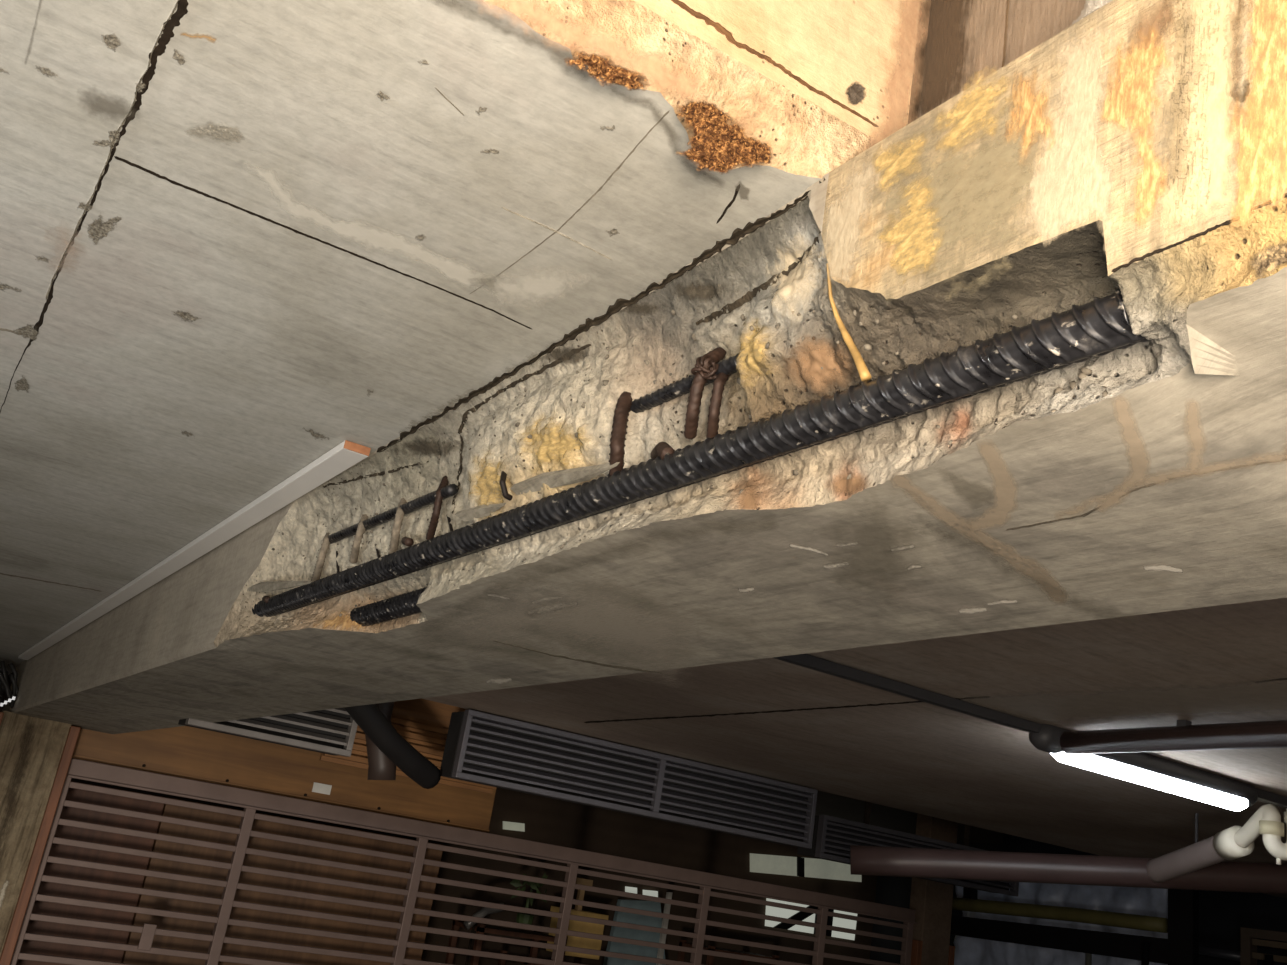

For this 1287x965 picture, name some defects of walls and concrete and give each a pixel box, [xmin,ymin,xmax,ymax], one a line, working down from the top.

crack [0,0,825,514]
crack [671,0,879,127]
water stain [908,0,969,120]
water stain [885,39,1112,269]
water stain [1157,0,1243,226]
spalling [214,197,1287,648]
crack [0,573,99,591]